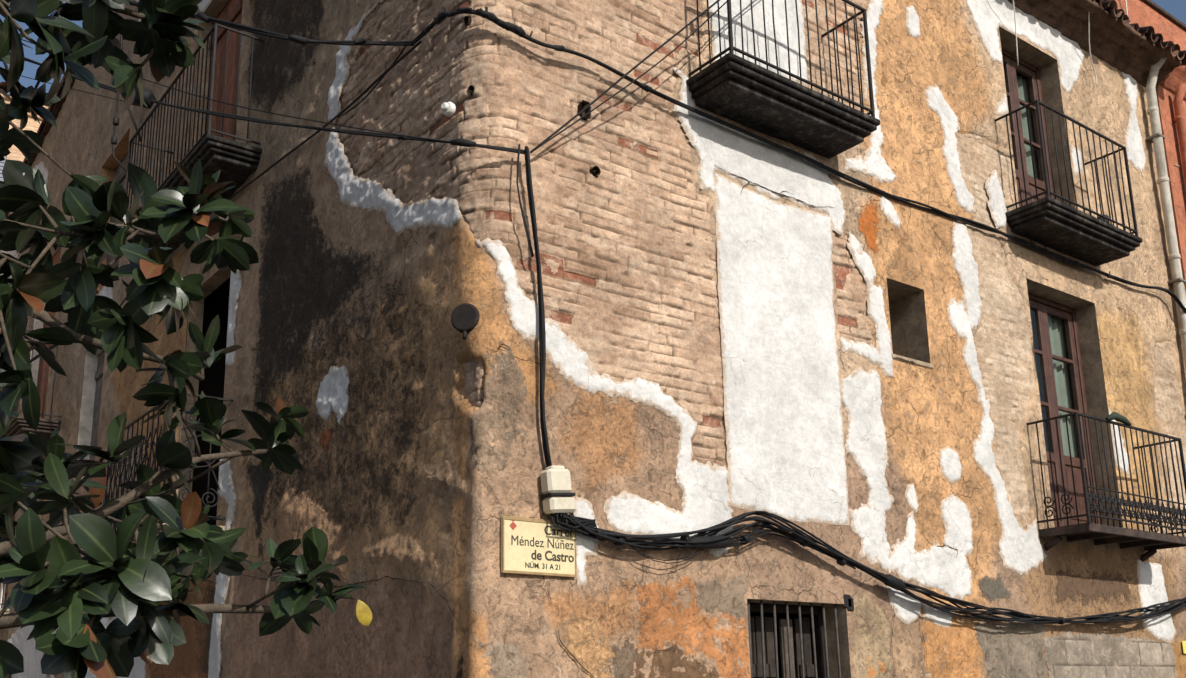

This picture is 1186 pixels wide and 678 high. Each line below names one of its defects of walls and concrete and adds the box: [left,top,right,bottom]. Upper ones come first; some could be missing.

damp [245,0,323,119]
spalling [802,0,867,110]
spalling [336,0,726,477]
spalling [832,231,873,345]
damp [243,165,427,556]
crack [333,576,457,622]
flaking render [558,576,750,678]